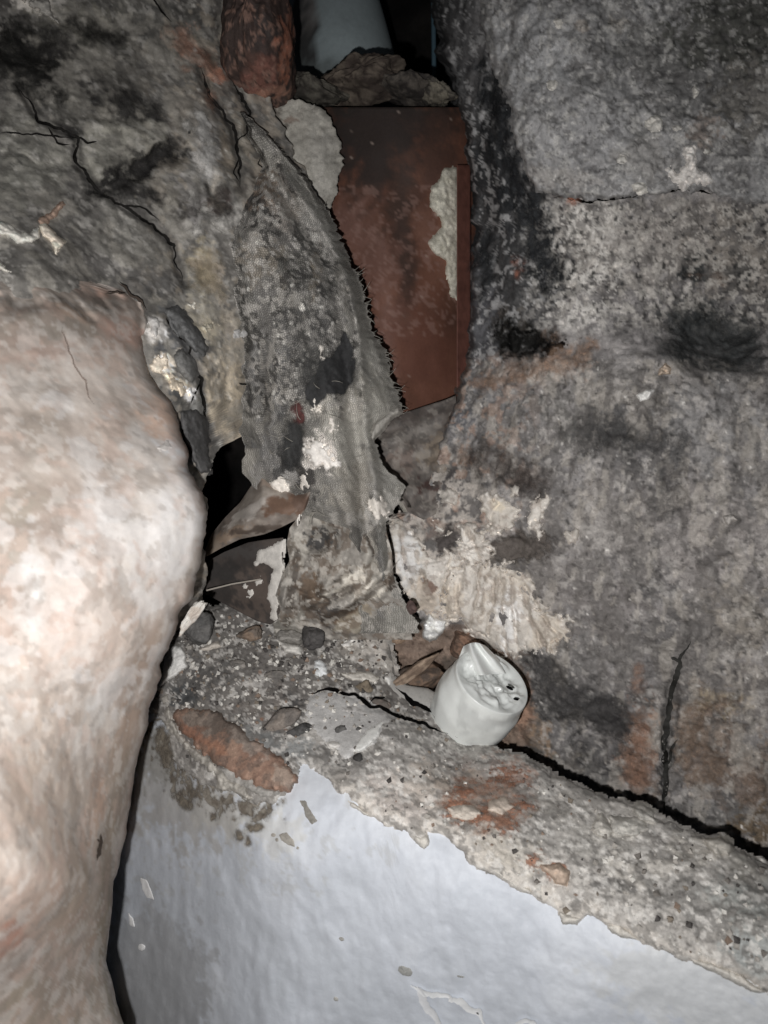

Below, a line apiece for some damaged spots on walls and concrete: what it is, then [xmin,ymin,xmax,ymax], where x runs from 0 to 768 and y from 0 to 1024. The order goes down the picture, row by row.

damp [644,115,683,132]
crack [3,89,183,278]
crack [554,195,638,204]
damp [632,182,648,195]
damp [665,145,714,192]
flaking render [269,398,342,492]
flaking render [367,483,576,660]
flaking render [564,528,580,544]
crack [311,687,448,734]
crack [661,641,691,814]
flaking render [148,539,768,995]
corrosion [442,762,534,835]